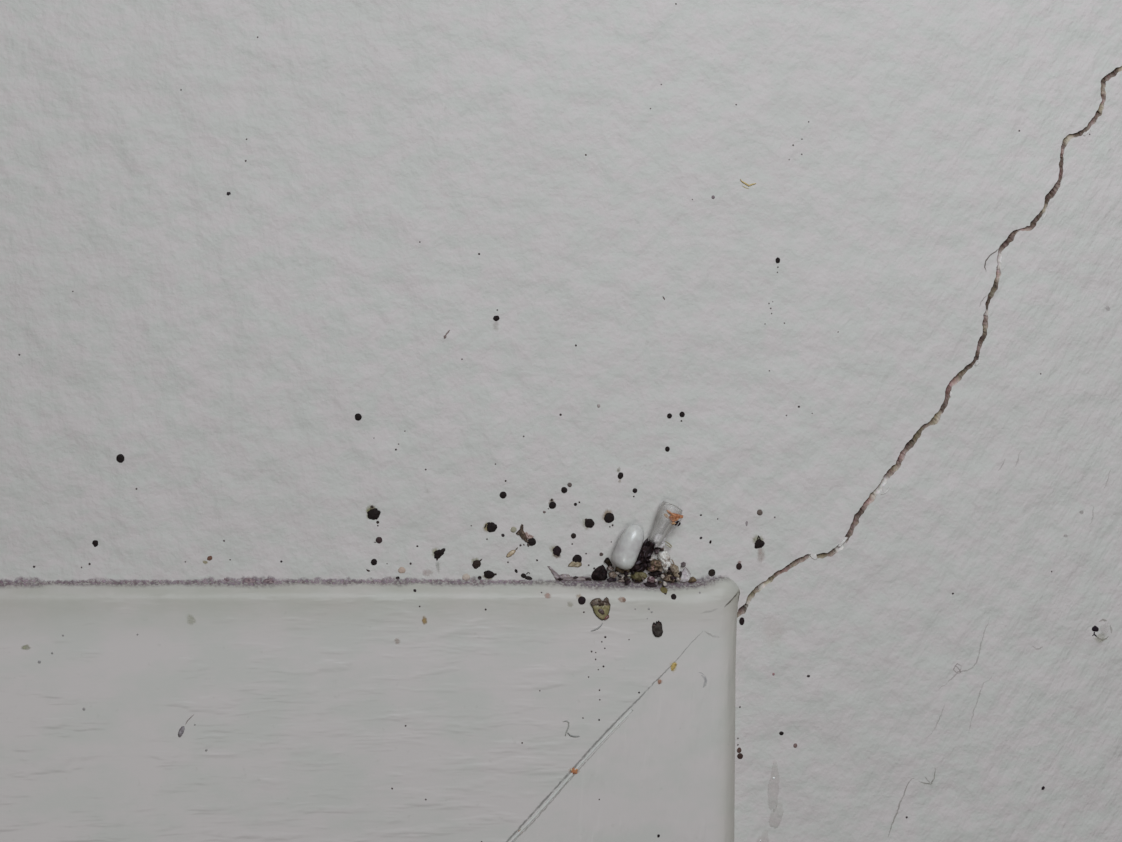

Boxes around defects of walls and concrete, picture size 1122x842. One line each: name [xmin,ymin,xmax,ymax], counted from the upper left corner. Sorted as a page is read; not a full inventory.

crack [737,66,1122,618]